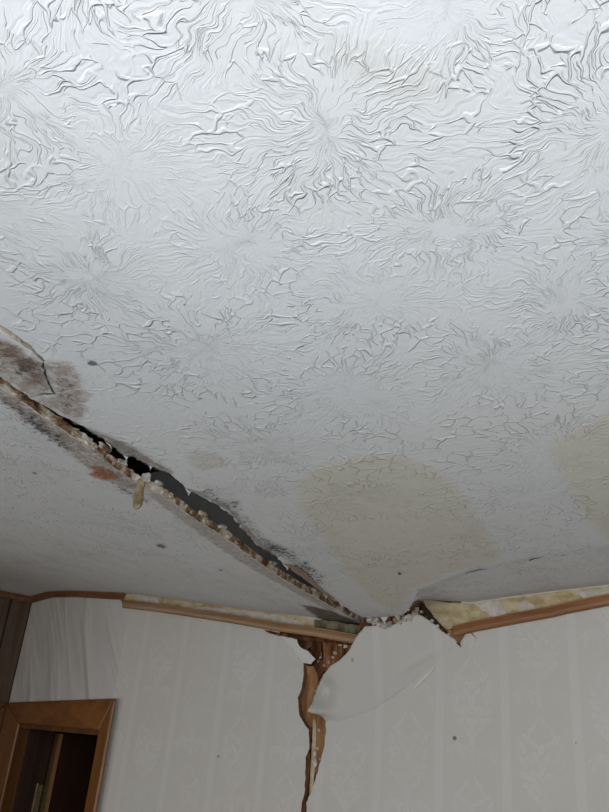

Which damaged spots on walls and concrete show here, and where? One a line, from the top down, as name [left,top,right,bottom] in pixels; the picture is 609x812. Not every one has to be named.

leakage [0,343,88,415]
leakage [0,393,136,495]
rust [90,467,116,481]
crack [0,325,364,623]
leakage [518,389,609,550]
leakage [190,441,521,613]
leakage [304,606,357,624]